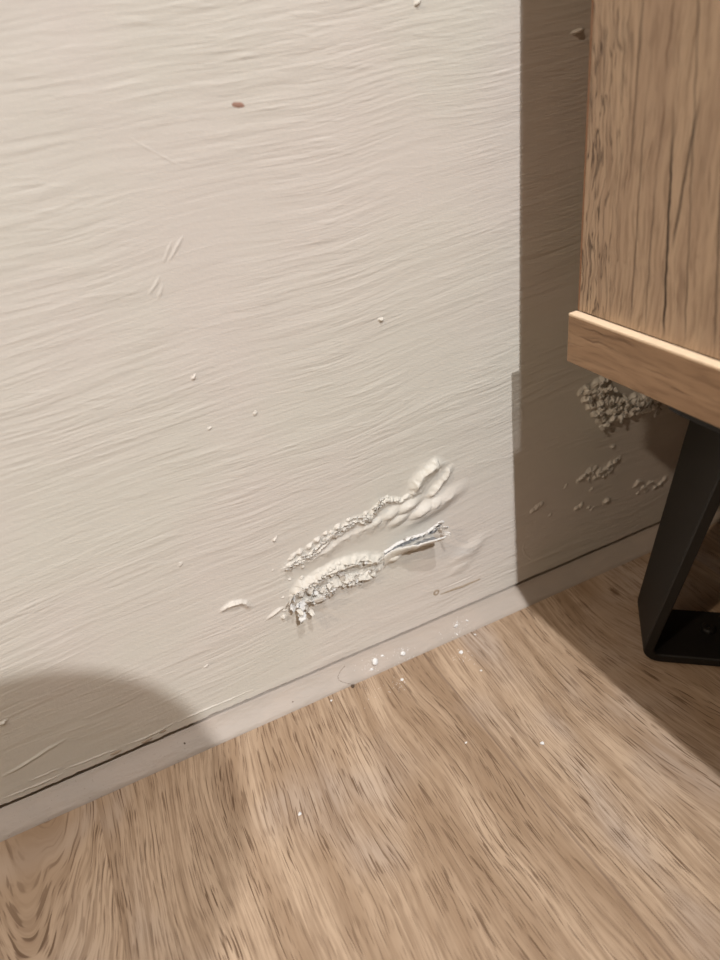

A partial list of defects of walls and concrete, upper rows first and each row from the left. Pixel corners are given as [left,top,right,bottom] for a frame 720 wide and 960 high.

peeling [577,376,662,431]
peeling [265,456,469,624]